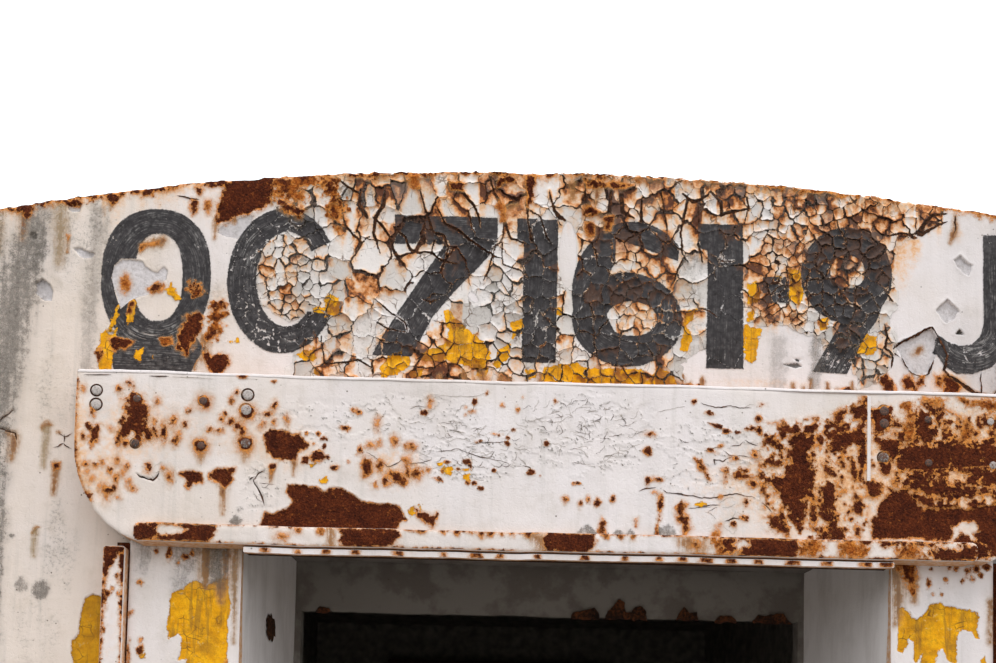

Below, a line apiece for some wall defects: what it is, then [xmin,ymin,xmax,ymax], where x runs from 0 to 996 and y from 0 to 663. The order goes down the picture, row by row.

rust [159,278,230,373]
rust [0,171,901,265]
crack [336,177,566,281]
peeling [250,172,962,390]
crack [584,185,749,288]
crack [883,325,894,368]
crack [889,213,948,239]
rust [74,378,211,502]
rust [133,369,996,643]
peeling [71,594,101,663]
peeling [166,578,231,663]
peeling [897,603,980,663]